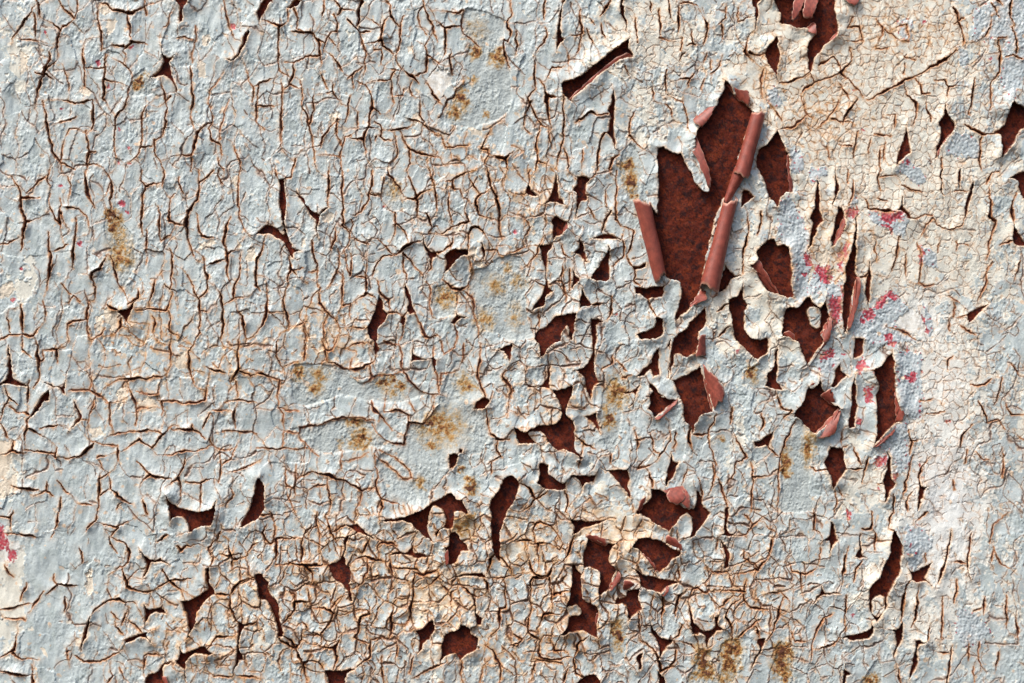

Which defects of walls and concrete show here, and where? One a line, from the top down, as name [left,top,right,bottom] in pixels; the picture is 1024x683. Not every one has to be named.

peeling [559,36,635,104]
peeling [750,0,859,85]
crack [514,0,1024,336]
peeling [165,495,218,535]
crack [0,0,595,683]
peeling [364,174,739,683]
peeling [620,78,866,514]
crack [575,389,945,677]
peeling [872,348,906,504]
crack [885,324,923,343]
crack [900,510,1020,683]
crack [952,363,1024,490]